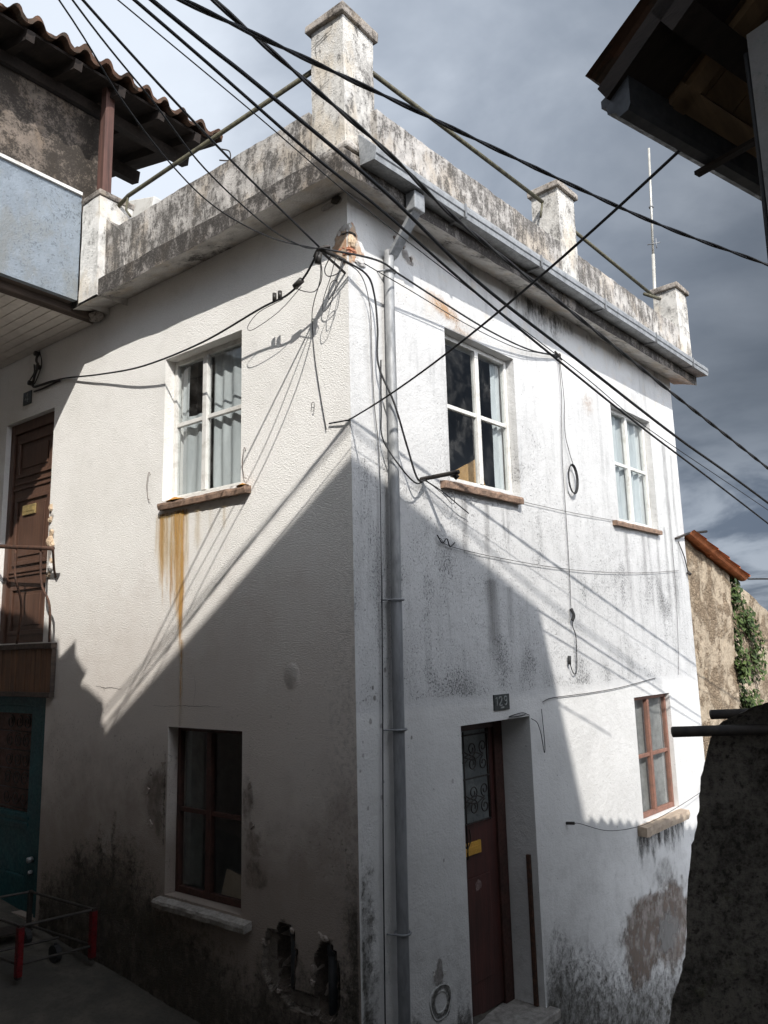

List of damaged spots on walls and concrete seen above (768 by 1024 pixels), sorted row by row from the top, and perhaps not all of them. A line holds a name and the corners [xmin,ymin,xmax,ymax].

spalling [332,223,366,267]
water stain [515,291,572,332]
rust [160,497,185,635]
water stain [38,838,376,1024]
spalling [262,920,341,1024]
mould [548,947,681,1024]